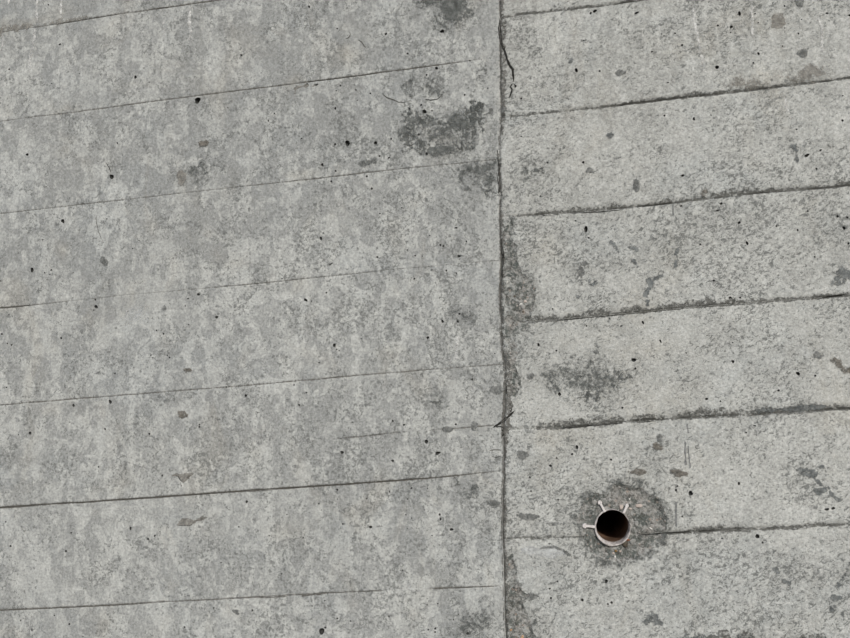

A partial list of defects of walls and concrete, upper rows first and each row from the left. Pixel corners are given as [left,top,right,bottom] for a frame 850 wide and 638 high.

leakage [413,0,474,31]
crack [498,18,516,98]
leakage [399,101,484,157]